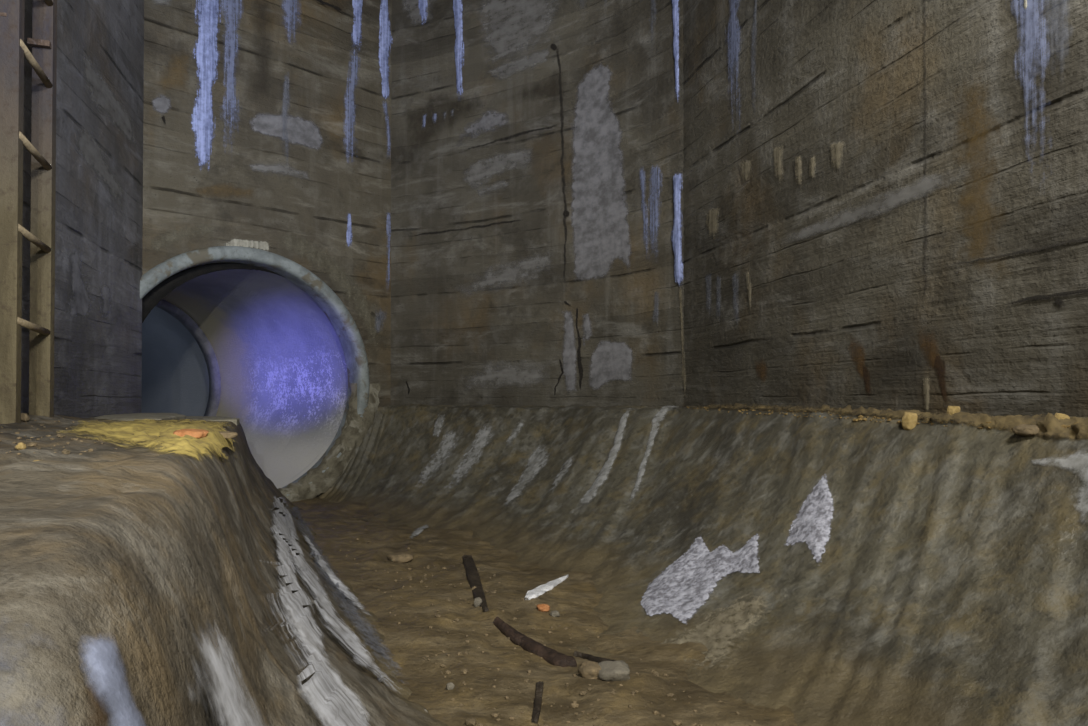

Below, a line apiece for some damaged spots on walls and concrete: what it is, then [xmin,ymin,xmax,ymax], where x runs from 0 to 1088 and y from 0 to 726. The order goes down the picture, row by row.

water stain [191,0,242,165]
water stain [345,0,363,156]
water stain [378,0,393,151]
water stain [413,0,470,142]
water stain [1014,0,1066,100]
crack [415,220,519,236]
crack [468,44,569,275]
peeling [571,65,631,280]
water stain [671,174,686,395]
spalling [641,534,760,623]
spalling [786,474,834,562]
water stain [85,638,145,726]